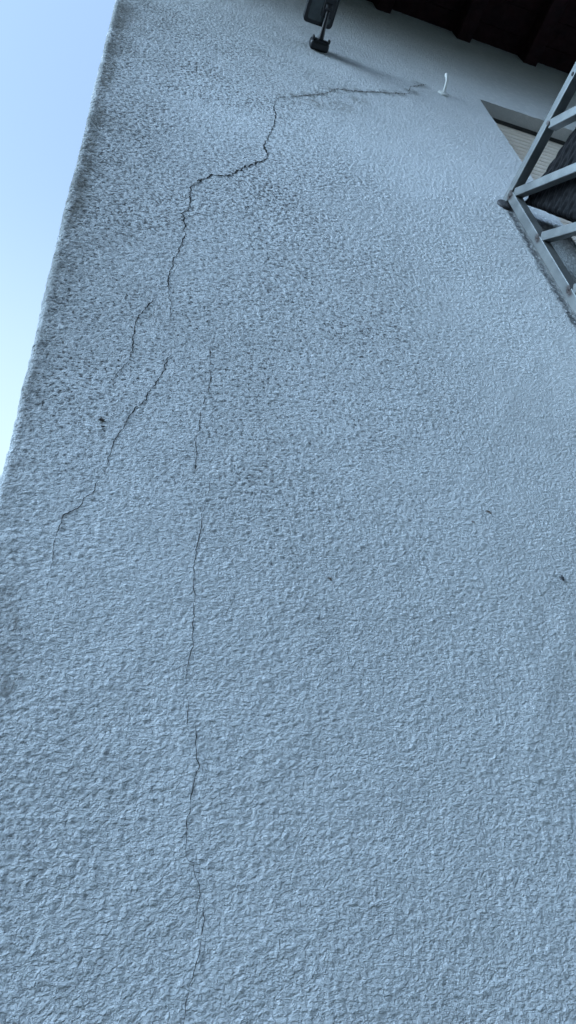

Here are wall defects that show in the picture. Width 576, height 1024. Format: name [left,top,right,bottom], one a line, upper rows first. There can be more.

crack [113,84,426,389]
crack [52,353,171,561]
crack [182,343,211,1024]